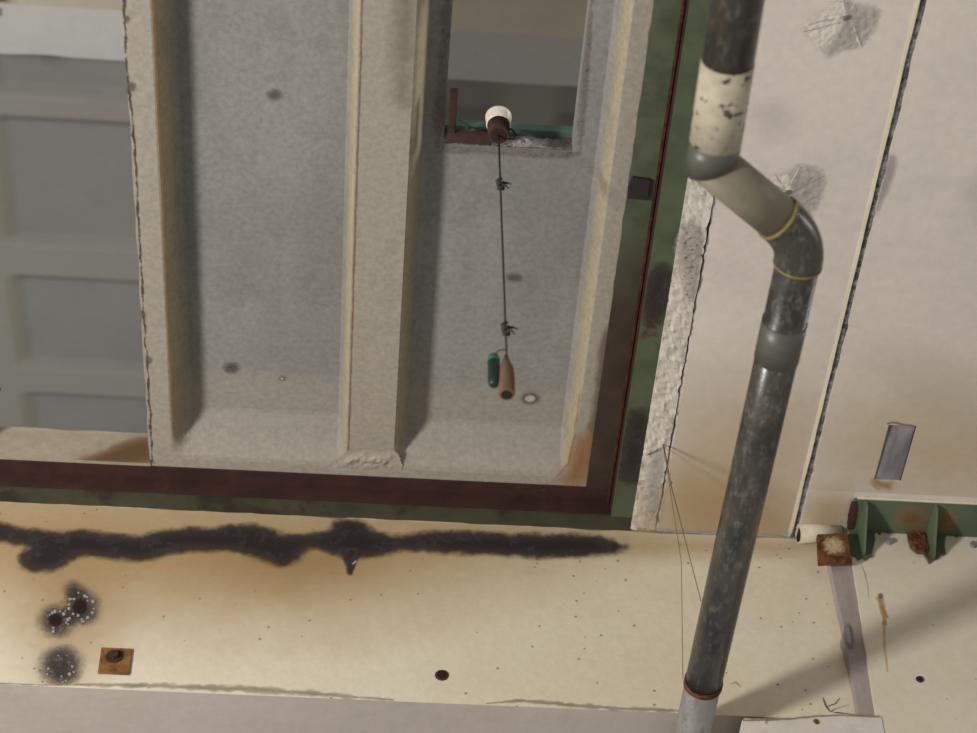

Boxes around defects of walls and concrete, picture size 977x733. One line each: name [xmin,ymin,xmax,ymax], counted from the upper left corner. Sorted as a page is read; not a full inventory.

crack [692,219,710,323]
corrosion [816,533,852,566]
corrosion [877,593,888,672]